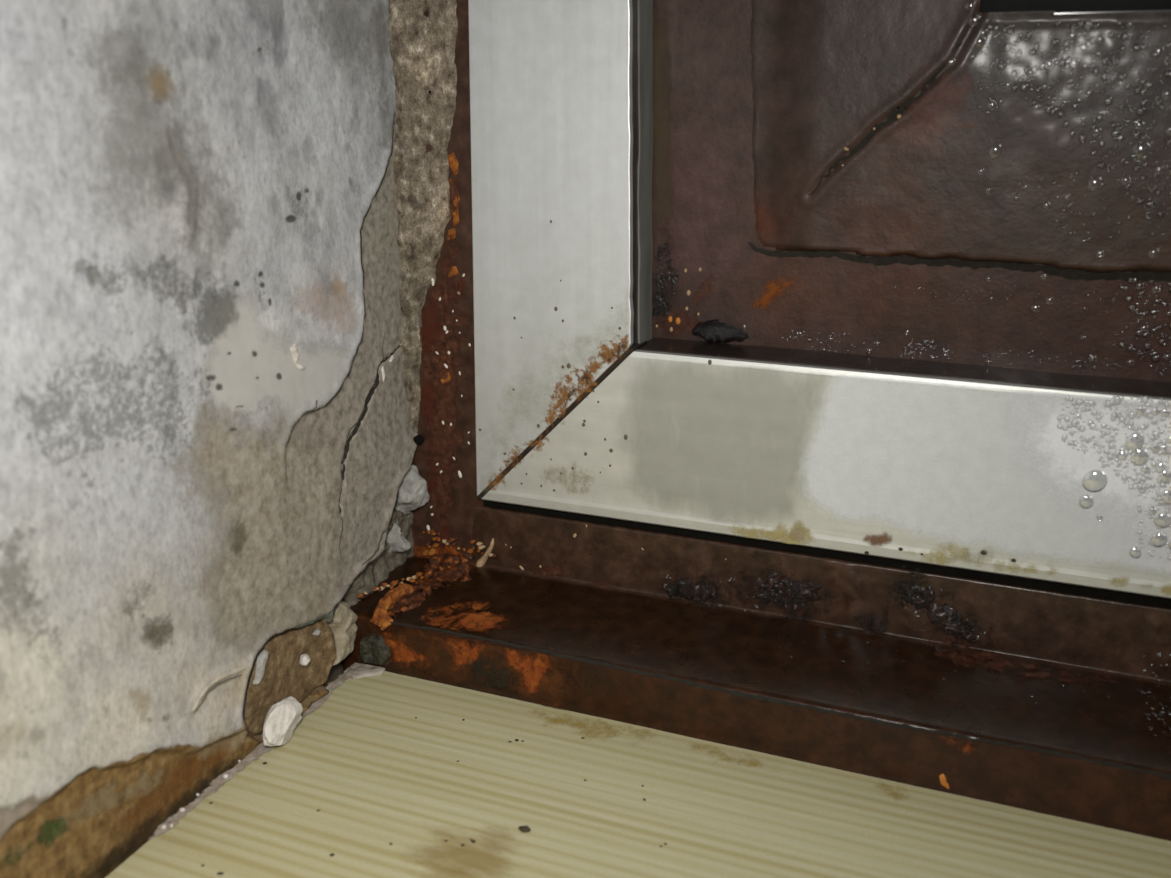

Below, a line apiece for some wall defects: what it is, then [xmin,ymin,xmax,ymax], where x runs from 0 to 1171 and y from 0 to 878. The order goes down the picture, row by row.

damp [0,725,263,878]
spalling [192,620,336,736]
spalling [204,115,418,586]
crack [243,334,417,731]
corrosion [357,153,576,709]
corrosion [489,327,628,491]